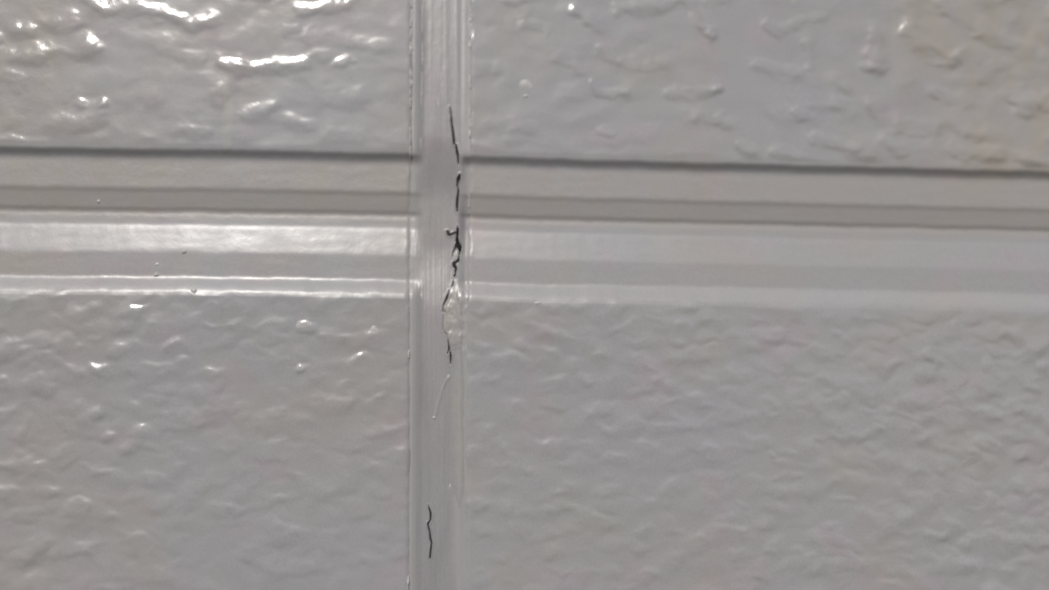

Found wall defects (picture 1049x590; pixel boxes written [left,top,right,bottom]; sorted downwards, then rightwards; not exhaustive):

crack [447,109,462,277]
crack [425,505,433,559]